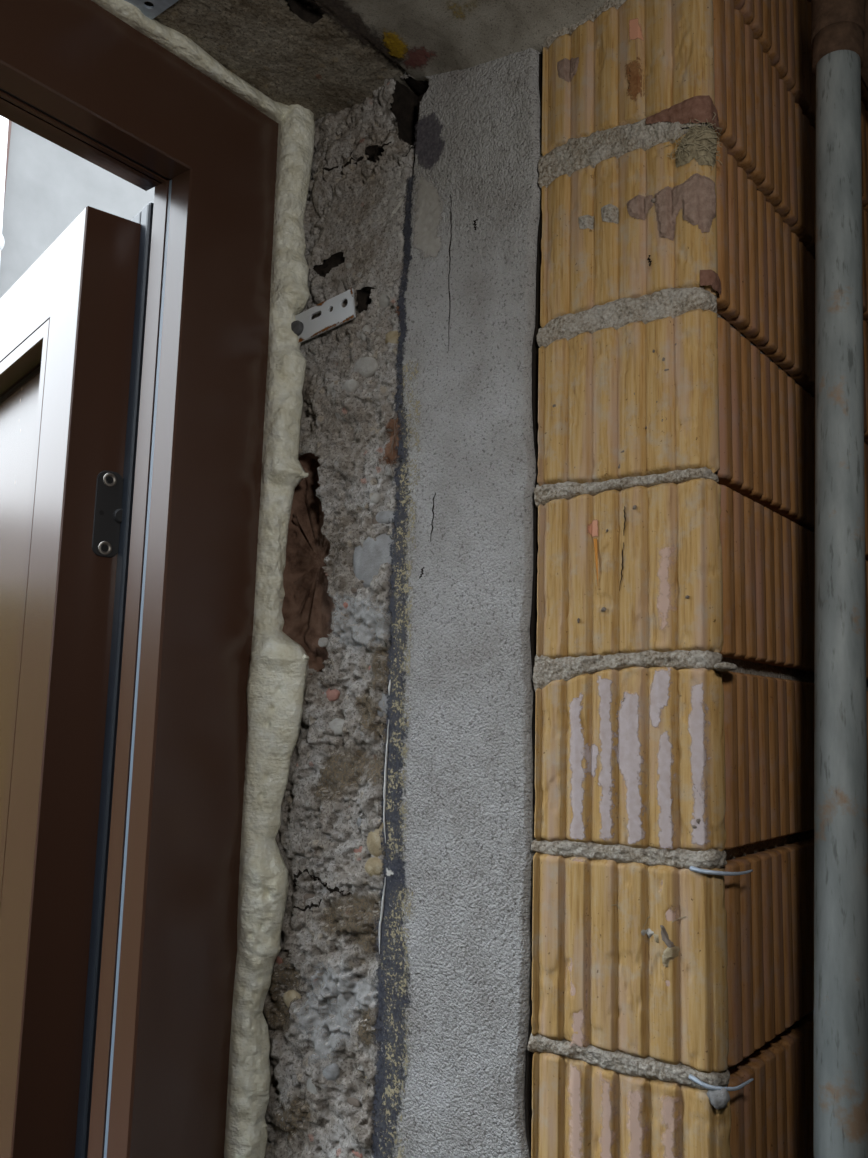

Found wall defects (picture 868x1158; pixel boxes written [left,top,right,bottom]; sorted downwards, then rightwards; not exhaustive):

spalling [287,0,325,24]
spalling [391,76,429,149]
spalling [365,145,385,163]
spalling [313,252,345,277]
spalling [356,287,376,313]
spalling [282,453,335,675]
crack [293,869,352,911]